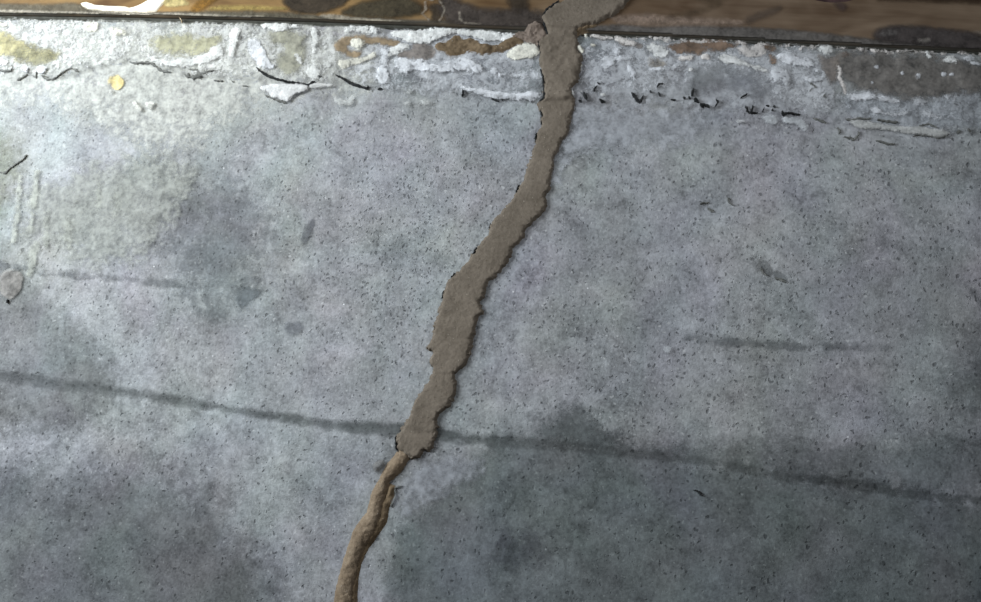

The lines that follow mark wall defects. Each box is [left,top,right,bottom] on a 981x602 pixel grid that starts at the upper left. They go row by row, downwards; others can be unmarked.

water stain [0,22,55,74]
water stain [84,22,126,35]
water stain [108,75,123,90]
water stain [142,23,320,79]
water stain [334,25,540,84]
water stain [461,86,542,101]
water stain [577,34,981,116]
water stain [0,291,115,429]
water stain [0,469,272,602]